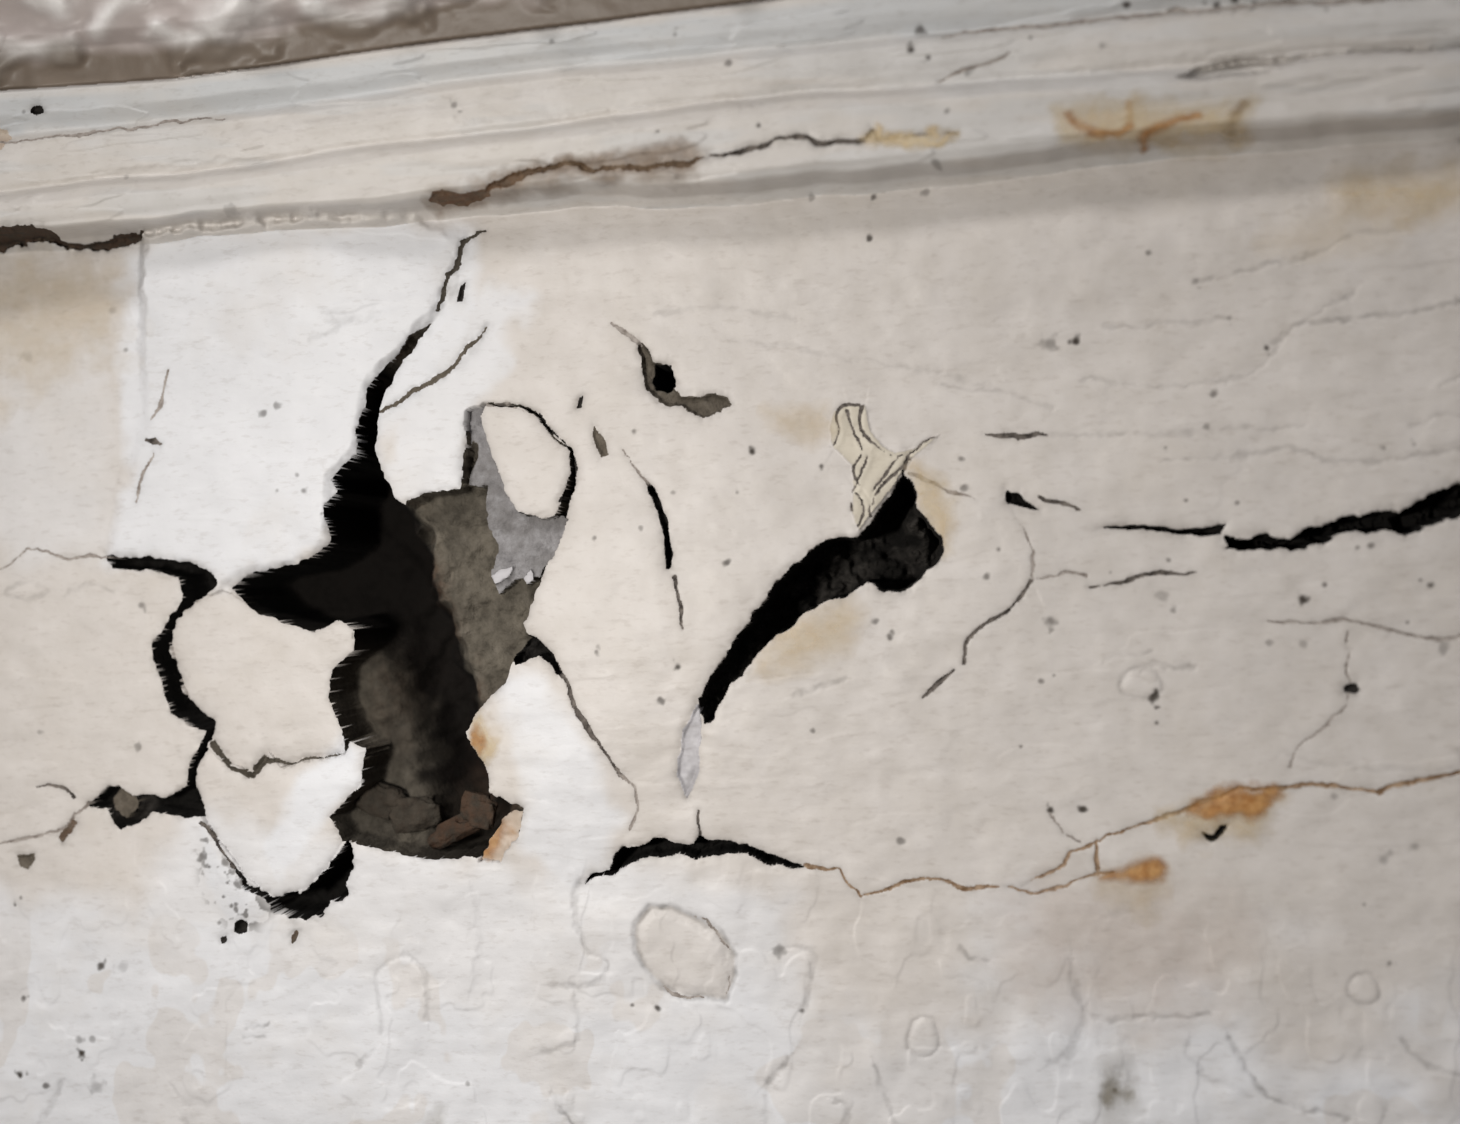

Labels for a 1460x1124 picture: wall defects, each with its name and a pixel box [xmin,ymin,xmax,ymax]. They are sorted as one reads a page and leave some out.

crack [0,224,144,254]
crack [428,126,958,312]
spalling [89,324,639,944]
crack [622,449,684,630]
spalling [677,402,975,836]
crack [922,524,1196,699]
crack [1103,482,1460,551]
crack [585,617,1460,898]
rust [1103,859,1165,881]
rust [1189,785,1279,820]